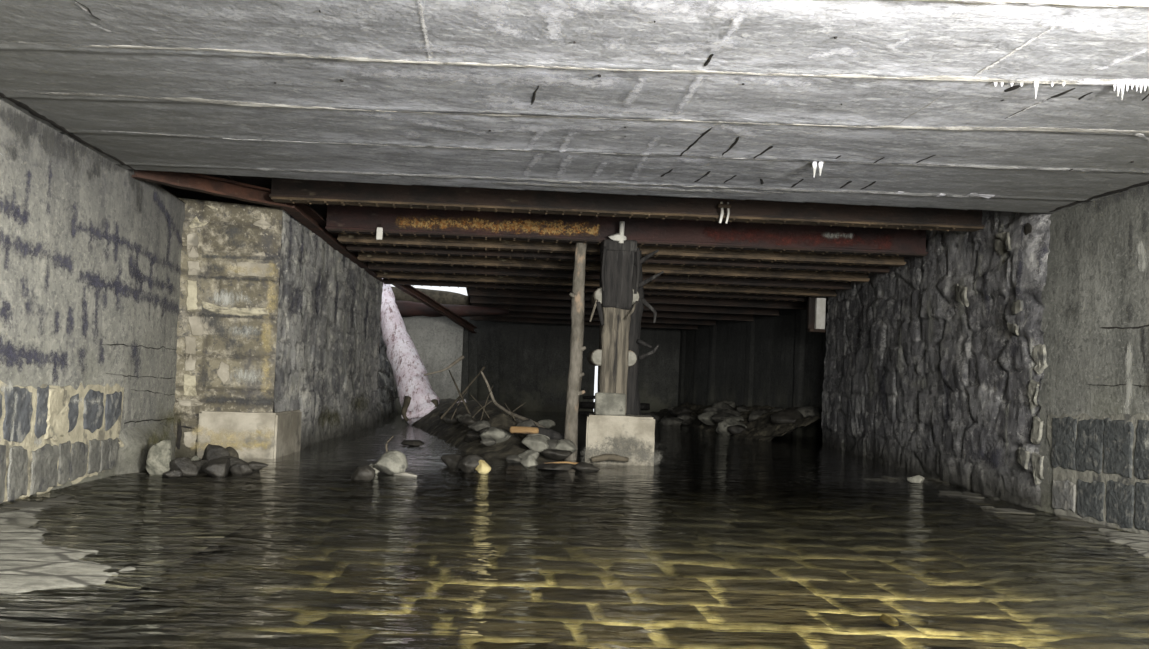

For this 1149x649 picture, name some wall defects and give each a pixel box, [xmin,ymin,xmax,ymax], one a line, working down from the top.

water stain [471,0,519,36]
water stain [539,0,595,40]
water stain [628,0,766,54]
water stain [892,0,1149,34]
water stain [40,43,1149,198]
crack [661,127,773,184]
corrosion [396,216,599,237]
water stain [1129,212,1148,271]
water stain [1124,305,1149,414]